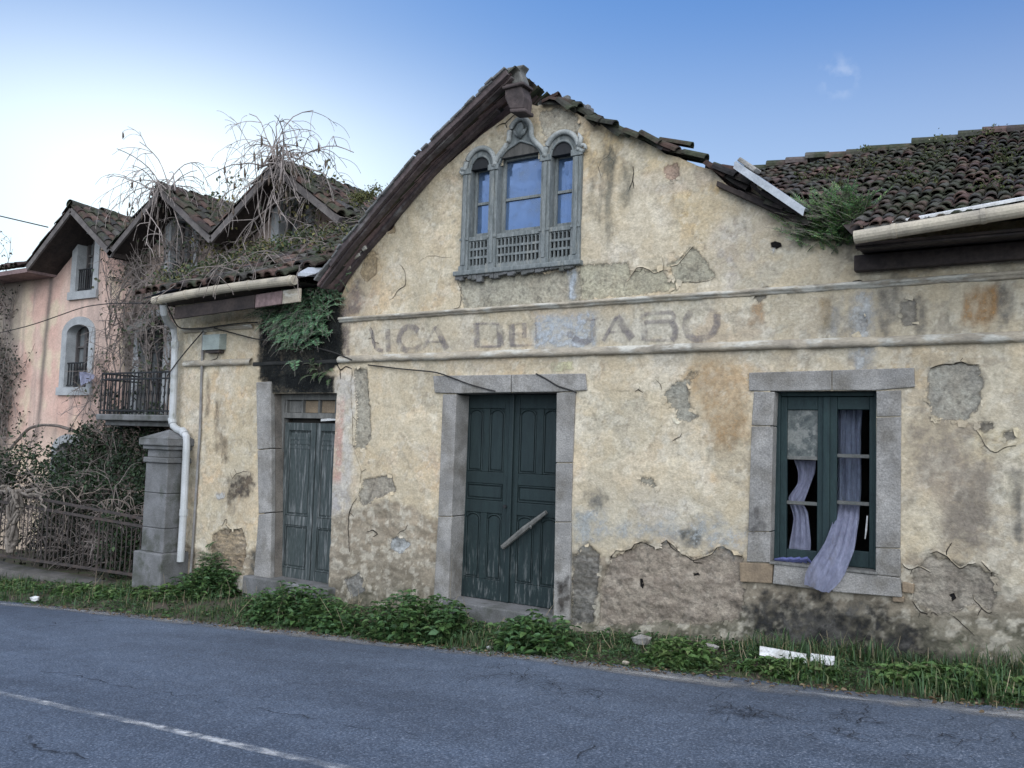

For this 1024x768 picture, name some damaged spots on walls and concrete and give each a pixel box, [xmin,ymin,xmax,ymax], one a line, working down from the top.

spalling [457,247,716,311]
spalling [354,366,373,453]
spalling [661,371,699,424]
spalling [923,363,1019,443]
crack [976,430,1016,453]
spalling [356,474,396,506]
spalling [209,526,247,573]
spalling [571,541,747,627]
spalling [911,556,1001,618]